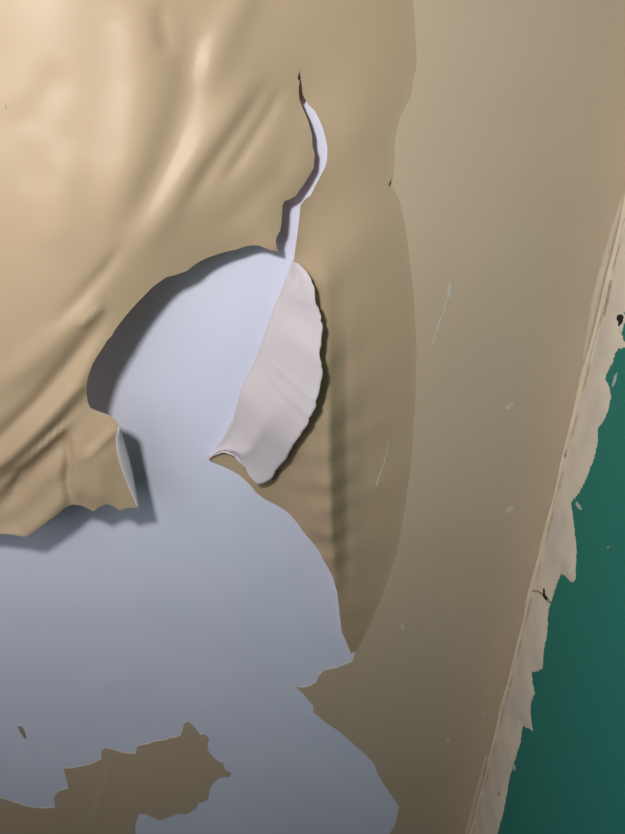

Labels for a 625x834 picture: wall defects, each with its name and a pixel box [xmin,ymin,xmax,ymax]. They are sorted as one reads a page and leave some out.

flaking render [0,0,399,834]